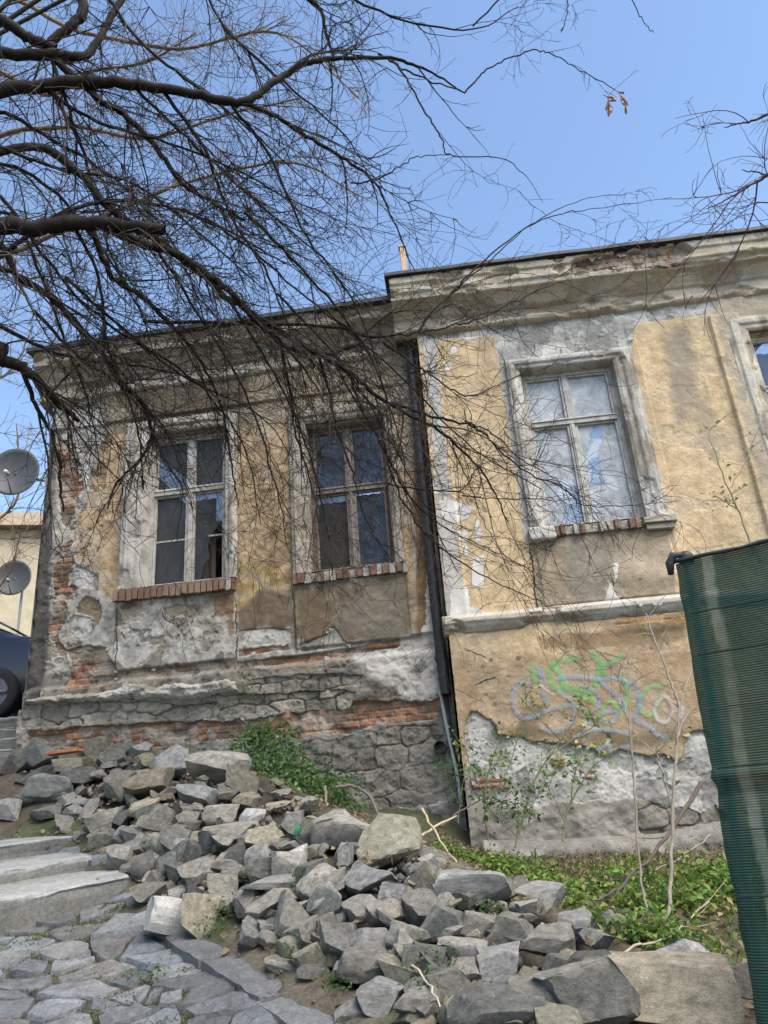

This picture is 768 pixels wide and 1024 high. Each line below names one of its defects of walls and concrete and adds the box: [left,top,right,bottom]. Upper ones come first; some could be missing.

flaking render [570,247,691,273]
spalling [428,301,718,370]
flaking render [48,405,220,690]
peeling [437,499,490,616]
flaking render [29,699,441,747]
spalling [464,712,718,813]